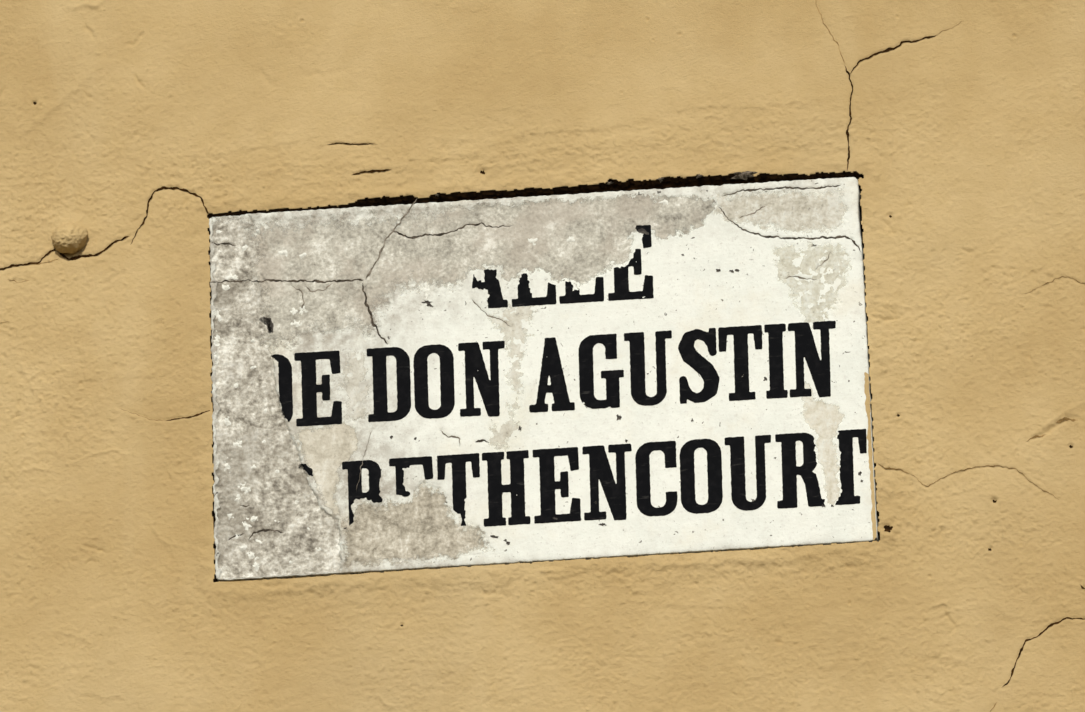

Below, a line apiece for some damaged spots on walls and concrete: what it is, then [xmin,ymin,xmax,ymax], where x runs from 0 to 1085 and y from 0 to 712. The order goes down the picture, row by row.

crack [724,6,958,218]
crack [0,186,236,283]
peeling [211,190,852,579]
crack [879,464,1059,500]
crack [990,617,1083,712]